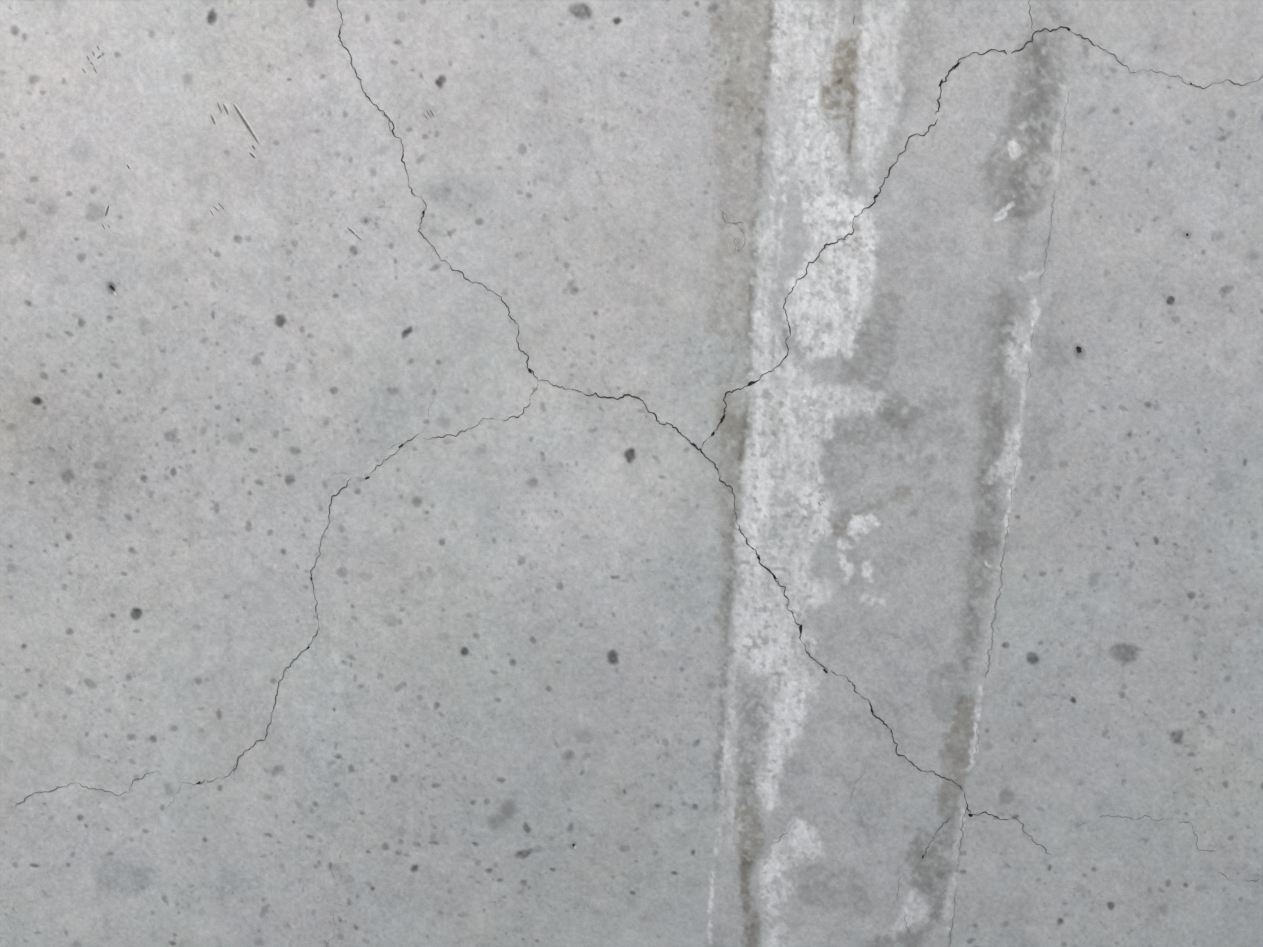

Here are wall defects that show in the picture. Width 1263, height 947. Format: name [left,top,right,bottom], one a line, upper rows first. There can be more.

crack [0,771,161,818]
crack [169,0,1263,858]
leakage [694,0,1083,947]